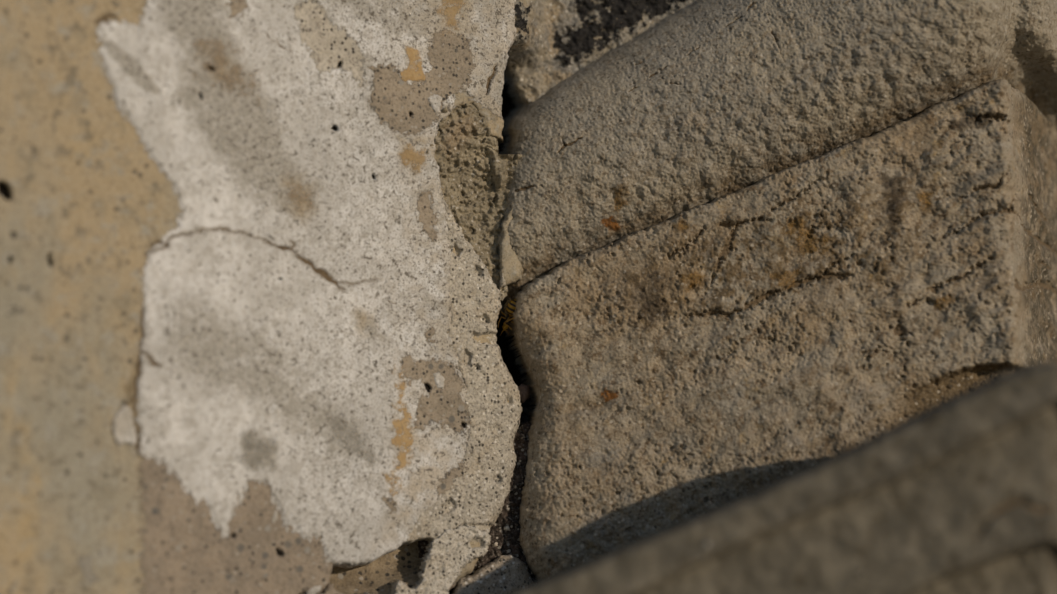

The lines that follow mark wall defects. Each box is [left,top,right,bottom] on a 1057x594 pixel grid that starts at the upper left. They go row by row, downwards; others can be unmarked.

spalling [293,0,523,300]
corrosion [401,47,425,81]
crack [486,66,518,154]
crack [987,113,1006,121]
crack [145,228,430,312]
crack [667,189,808,283]
crack [687,258,850,318]
crack [942,166,1057,295]
peeling [111,405,491,594]
corrosion [385,374,416,496]
crack [449,315,538,594]
crack [418,540,429,558]